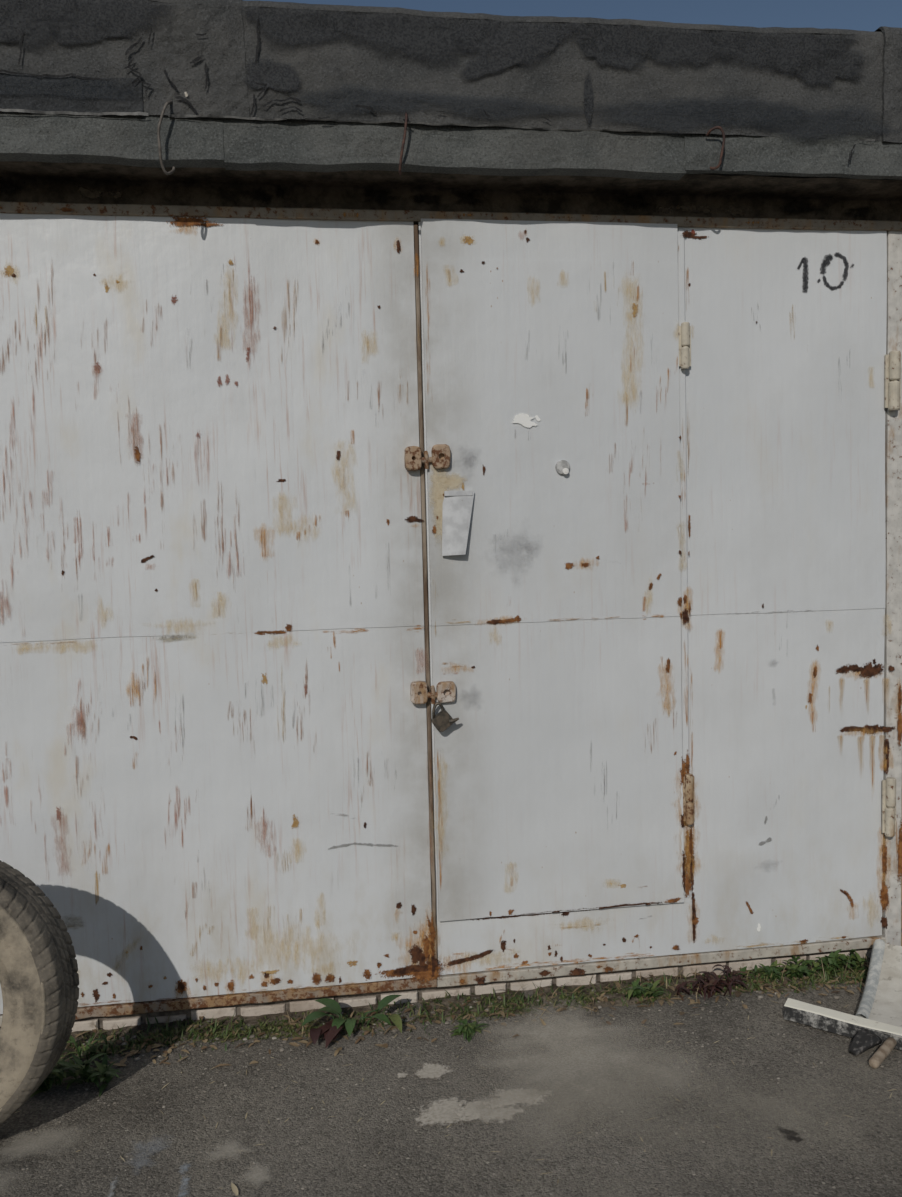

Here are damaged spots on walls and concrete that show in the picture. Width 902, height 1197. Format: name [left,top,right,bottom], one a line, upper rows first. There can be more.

corrosion [166,214,223,227]
peeling [512,413,541,428]
corrosion [486,615,521,625]
corrosion [677,595,691,624]
corrosion [805,646,819,730]
corrosion [836,659,902,786]
corrosion [674,742,693,786]
corrosion [466,814,699,943]
corrosion [879,817,902,929]
corrosion [249,902,446,994]
corrosion [460,935,638,985]
corrosion [148,976,234,1000]